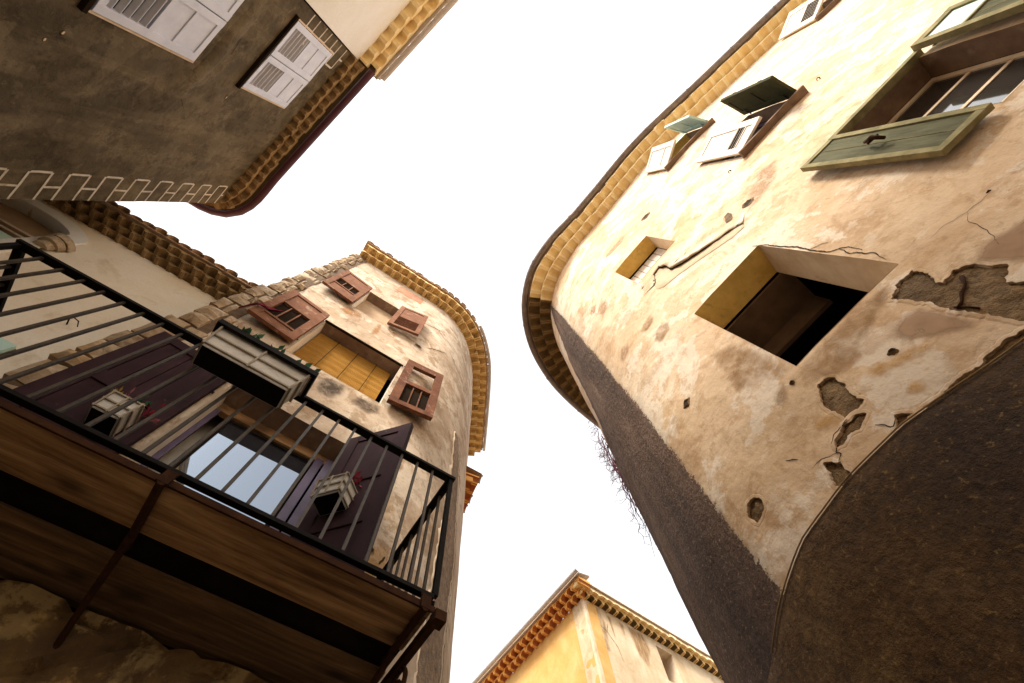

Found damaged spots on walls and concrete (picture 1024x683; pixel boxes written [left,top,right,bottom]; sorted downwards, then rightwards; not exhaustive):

crack [936,193,999,244]
crack [756,242,885,259]
flaking render [887,260,1024,433]
flaking render [813,374,871,491]
flaking render [745,494,767,527]